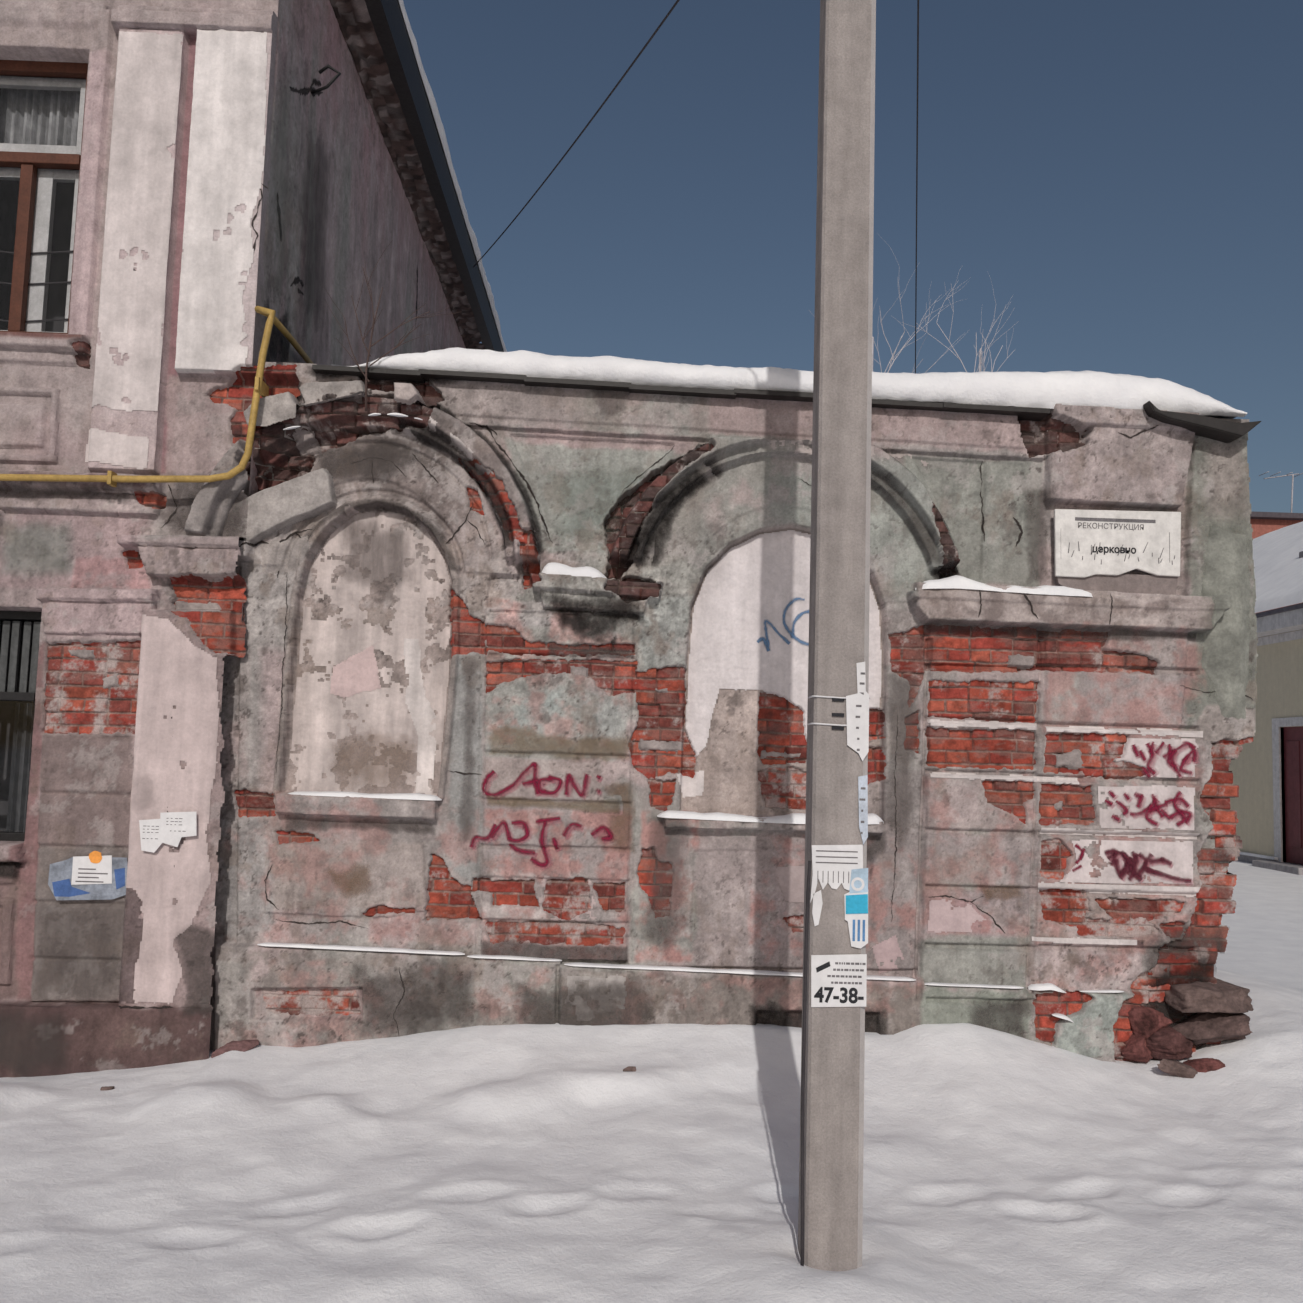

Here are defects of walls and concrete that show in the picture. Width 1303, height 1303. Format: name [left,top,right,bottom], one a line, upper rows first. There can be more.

peeling [72,29,541,589]
flaking render [1017,413,1087,458]
flaking render [604,443,714,603]
peeling [289,510,811,811]
peeling [44,573,247,1004]
flaking render [363,847,673,946]
peeling [775,866,805,933]
crack [932,895,1005,933]
flaking render [868,585,1253,1062]